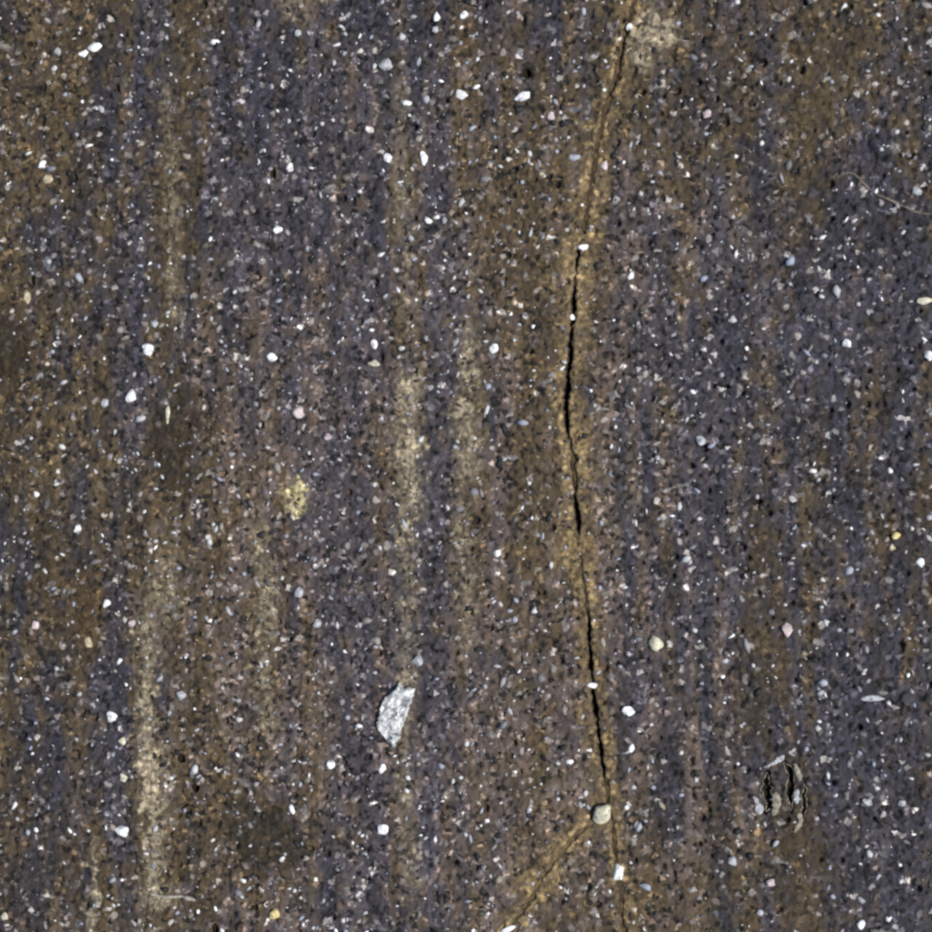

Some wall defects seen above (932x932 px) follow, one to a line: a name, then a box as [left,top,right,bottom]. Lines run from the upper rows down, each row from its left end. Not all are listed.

crack [510,0,637,932]